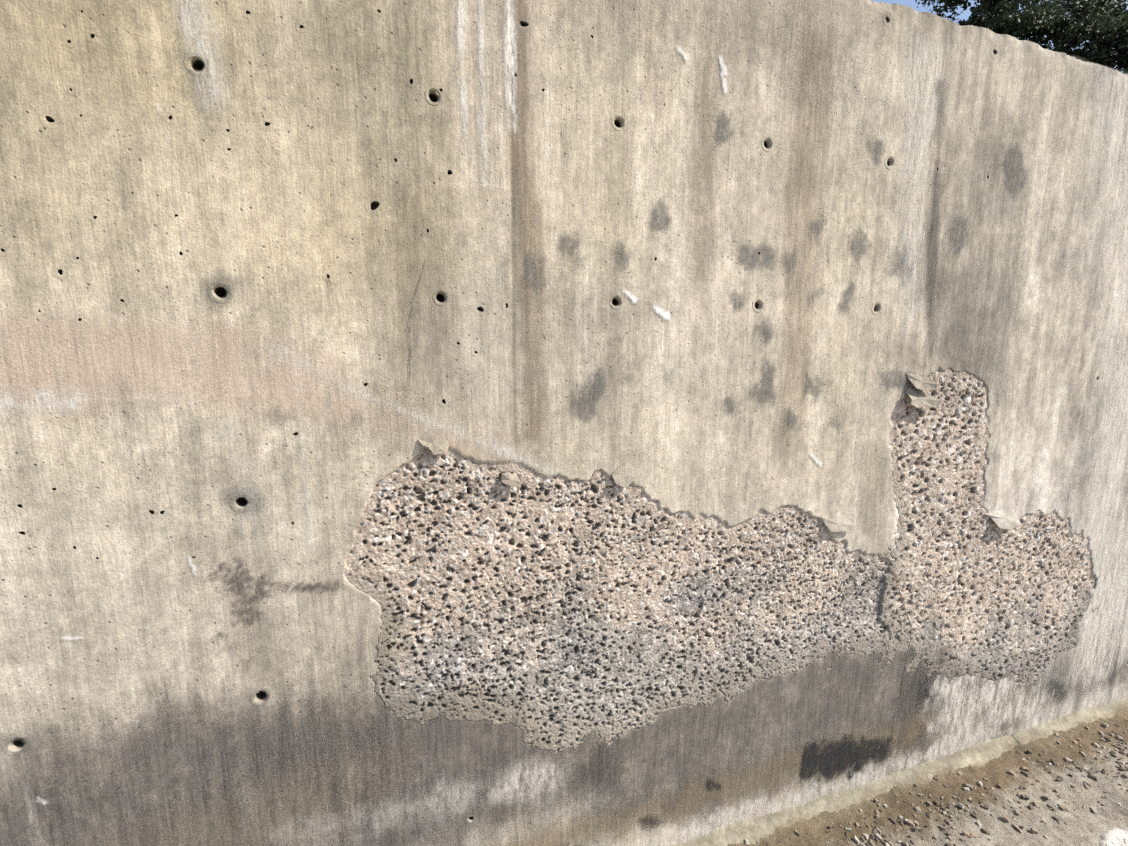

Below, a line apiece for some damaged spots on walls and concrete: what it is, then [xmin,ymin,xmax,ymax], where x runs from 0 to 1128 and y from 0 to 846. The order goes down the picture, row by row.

damp [717,115,732,141]
damp [868,141,882,162]
damp [897,47,941,312]
damp [652,201,670,229]
damp [741,246,794,269]
damp [0,390,81,412]
damp [572,372,605,417]
damp [750,365,774,402]
peeling [209,368,1097,754]
damp [0,541,1128,846]